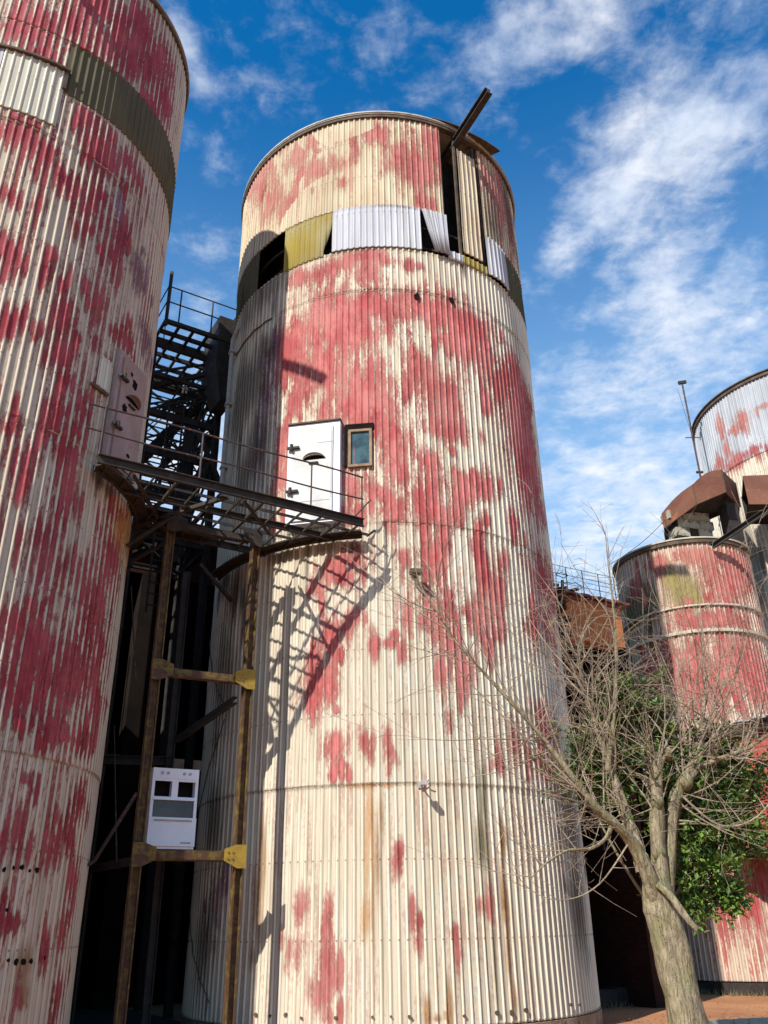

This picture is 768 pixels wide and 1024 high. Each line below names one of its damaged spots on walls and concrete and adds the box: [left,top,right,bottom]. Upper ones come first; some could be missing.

peeling [0,0,178,137]
peeling [247,118,442,224]
peeling [478,153,516,262]
peeling [264,249,559,735]
peeling [711,403,768,473]
peeling [0,104,154,1024]
peeling [627,544,768,720]
peeling [323,726,397,784]
peeling [309,894,344,1024]
peeling [391,837,404,878]
peeling [409,894,423,958]
peeling [703,857,768,964]